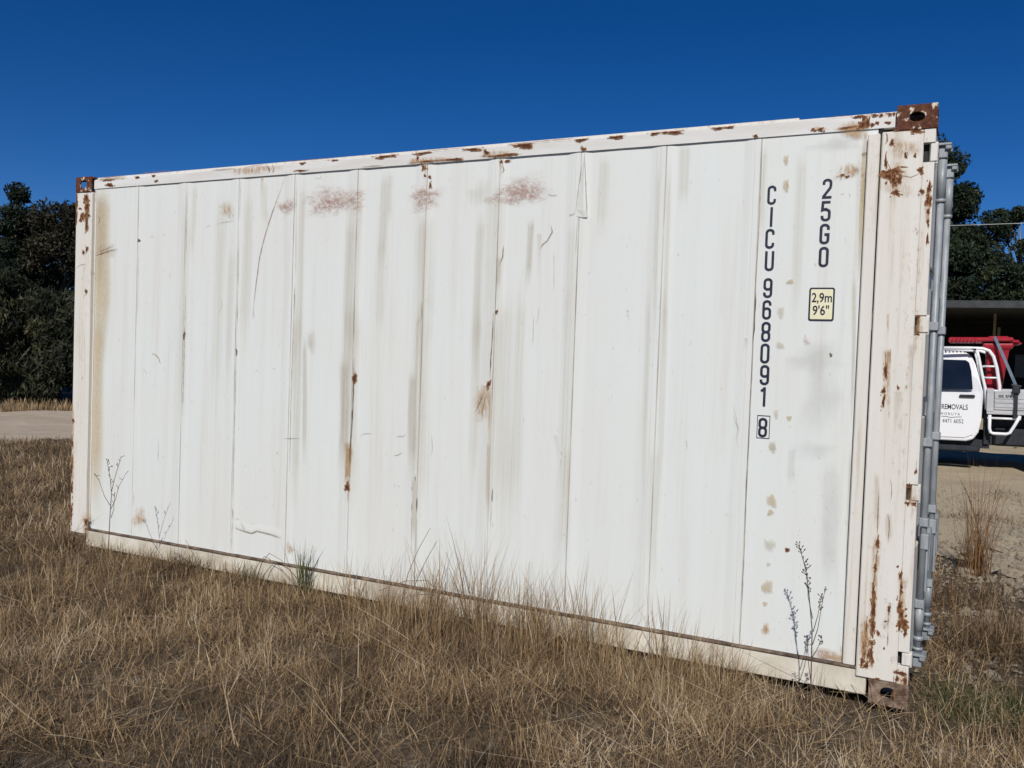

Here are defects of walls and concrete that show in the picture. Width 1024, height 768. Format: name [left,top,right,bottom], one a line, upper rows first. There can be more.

corrosion [75,193,90,231]
water stain [95,206,106,312]
corrosion [412,138,589,188]
corrosion [811,112,932,246]
corrosion [70,419,88,526]
water stain [92,336,101,463]
corrosion [344,371,357,492]
corrosion [880,351,900,412]
corrosion [859,517,910,681]
corrosion [892,670,907,700]